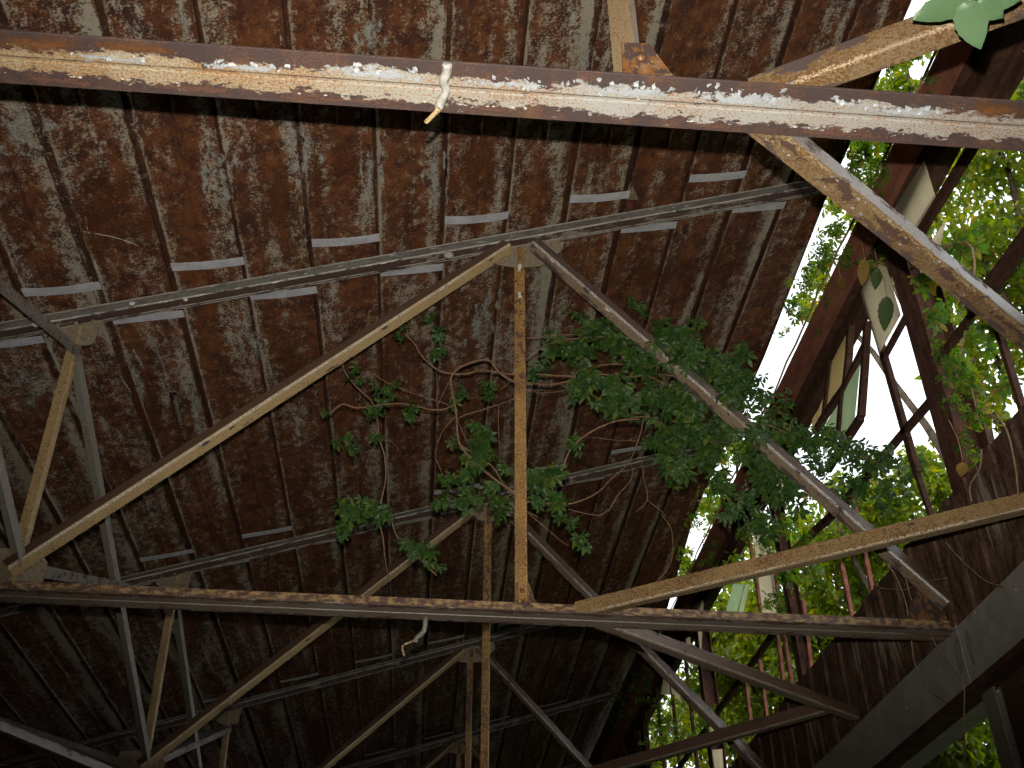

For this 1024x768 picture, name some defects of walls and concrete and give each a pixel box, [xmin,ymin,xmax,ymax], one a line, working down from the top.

rust [0,36,74,52]
rust [96,42,173,54]
rust [18,75,104,88]
rust [121,78,230,95]
peeling [320,62,423,82]
rust [458,104,526,113]
peeling [464,50,675,100]
peeling [695,83,792,107]
peeling [831,95,942,116]
rust [765,126,904,161]
rust [813,175,920,249]
rust [933,260,972,295]